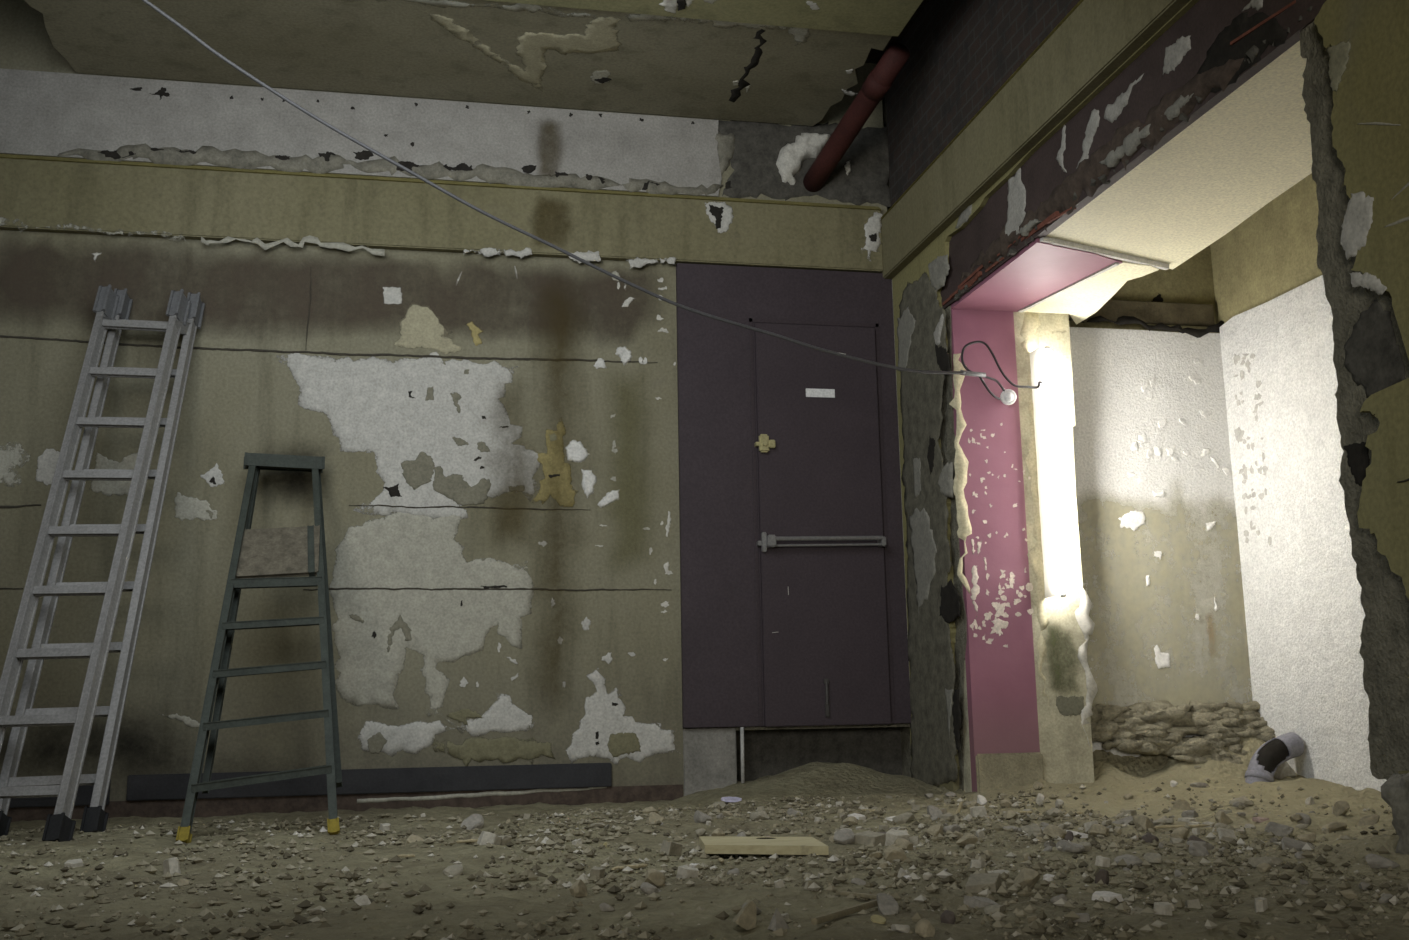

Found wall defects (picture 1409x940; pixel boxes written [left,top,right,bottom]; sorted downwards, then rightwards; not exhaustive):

flaking render [1242,0,1263,11]
peeling [1327,39,1351,94]
spalling [0,120,891,261]
peeling [1340,191,1387,295]
flaking render [897,35,1275,787]
peeling [277,287,681,766]
flaking render [1381,773,1409,855]